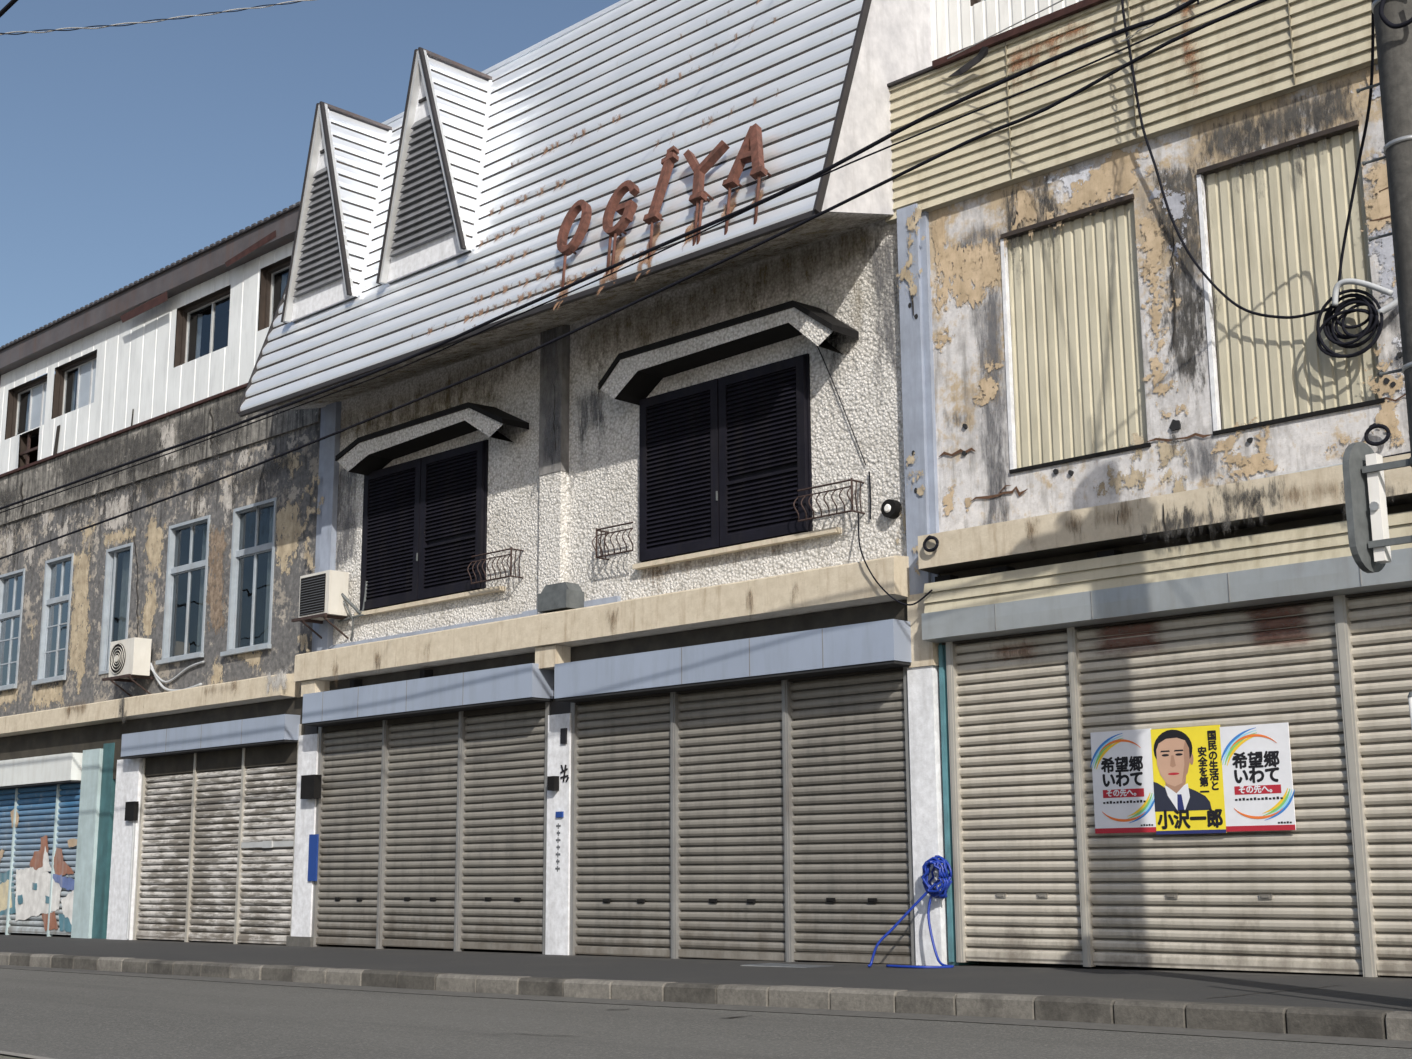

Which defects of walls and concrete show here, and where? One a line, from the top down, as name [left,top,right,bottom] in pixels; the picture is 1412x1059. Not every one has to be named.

peeling [1351,64,1381,101]
damp [278,218,900,465]
corrosion [721,180,764,217]
peeling [896,142,1192,502]
damp [1157,83,1354,387]
peeling [1324,145,1406,458]
peeling [0,490,166,712]
damp [60,427,171,543]
peeling [185,448,254,635]
corrosion [1100,621,1158,650]
damp [1143,433,1291,540]
corrosion [1249,607,1306,642]